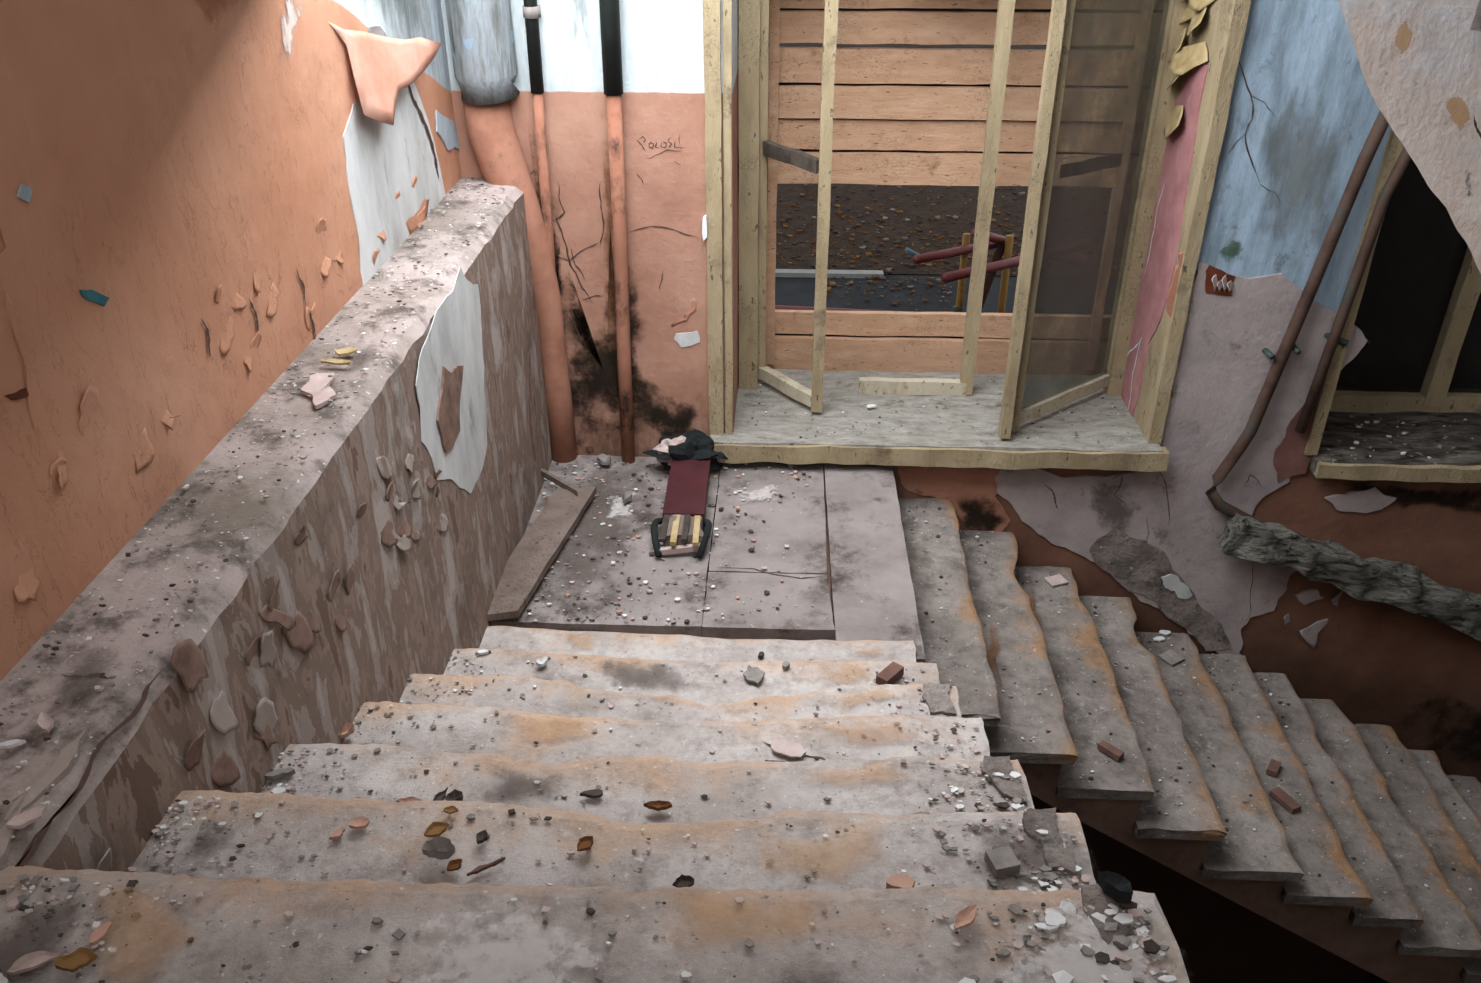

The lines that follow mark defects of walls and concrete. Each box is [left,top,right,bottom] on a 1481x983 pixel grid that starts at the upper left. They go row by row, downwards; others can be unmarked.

damp [281,0,301,54]
peeling [320,21,460,288]
peeling [201,272,280,372]
peeling [296,268,317,340]
damp [554,170,695,437]
peeling [1324,487,1397,513]
peeling [13,568,41,603]